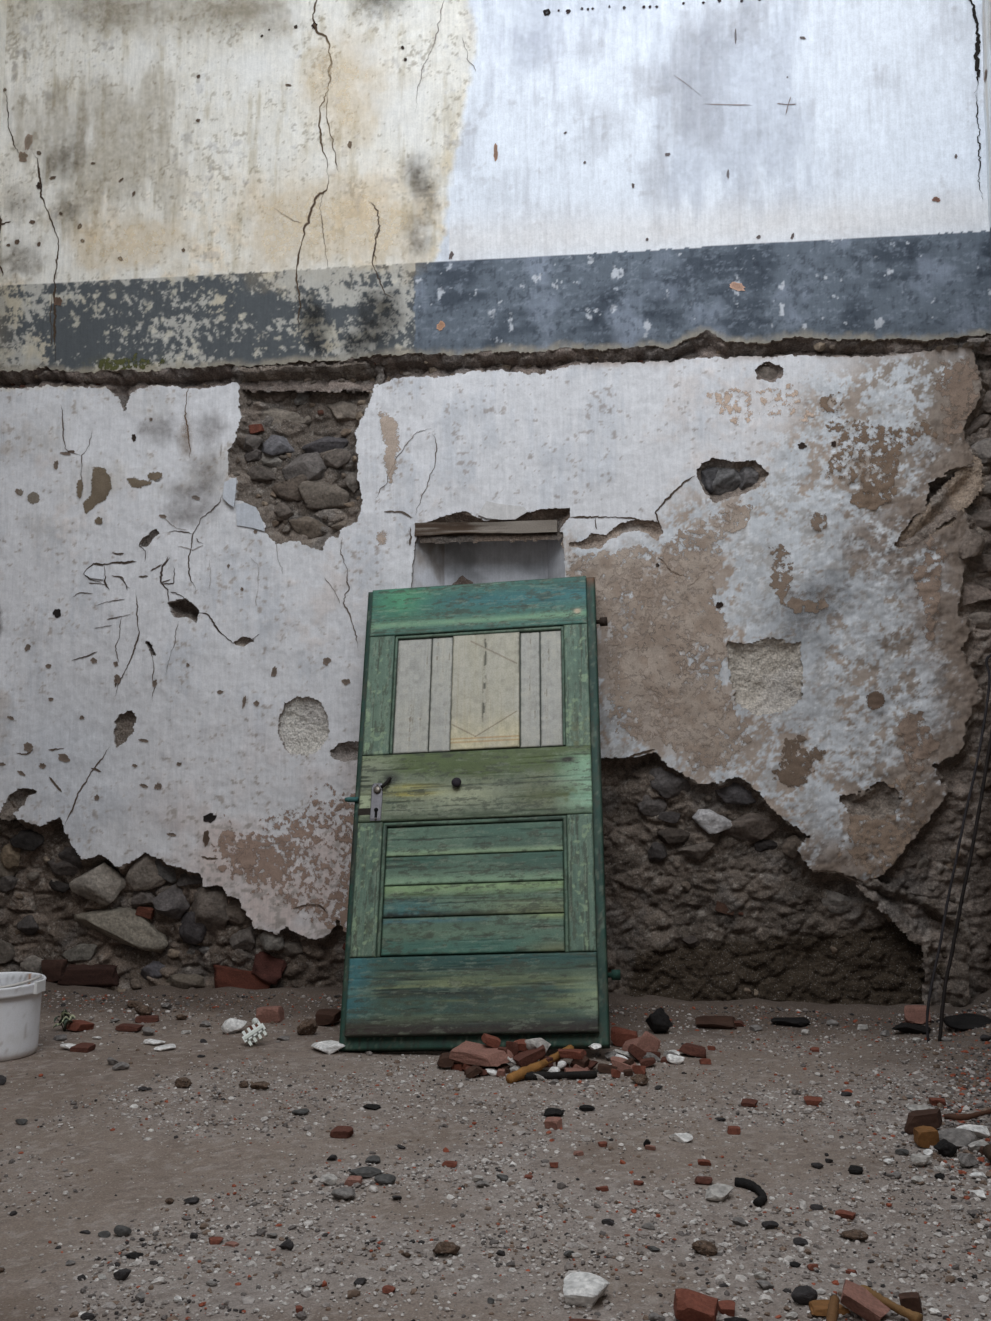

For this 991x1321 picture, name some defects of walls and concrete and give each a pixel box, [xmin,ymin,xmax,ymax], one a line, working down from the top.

crack [280,0,338,326]
crack [416,1,476,108]
crack [969,0,982,196]
crack [61,407,92,480]
crack [184,386,222,457]
crack [73,496,283,701]
crack [325,540,358,647]
spalling [0,330,991,1007]